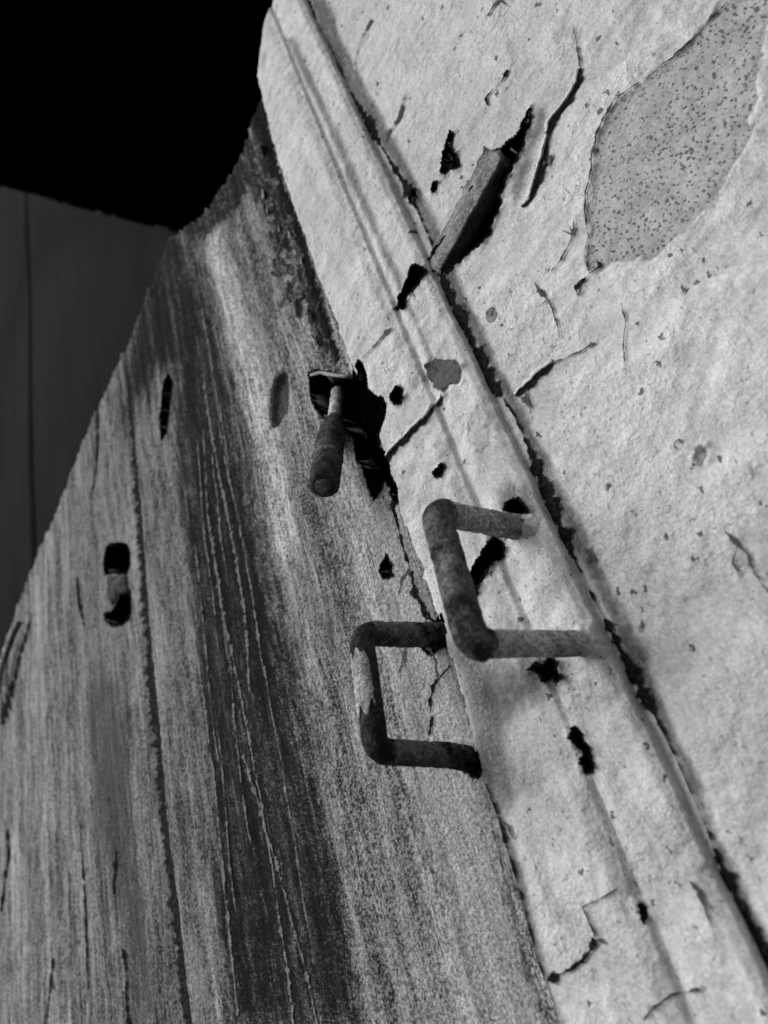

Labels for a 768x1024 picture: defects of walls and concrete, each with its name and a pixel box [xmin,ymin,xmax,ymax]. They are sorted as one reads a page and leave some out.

spalling [439,129,461,176]
peeling [586,0,768,271]
crack [307,0,768,970]
spalling [526,658,563,686]
spalling [566,725,595,775]
crack [485,784,617,1003]